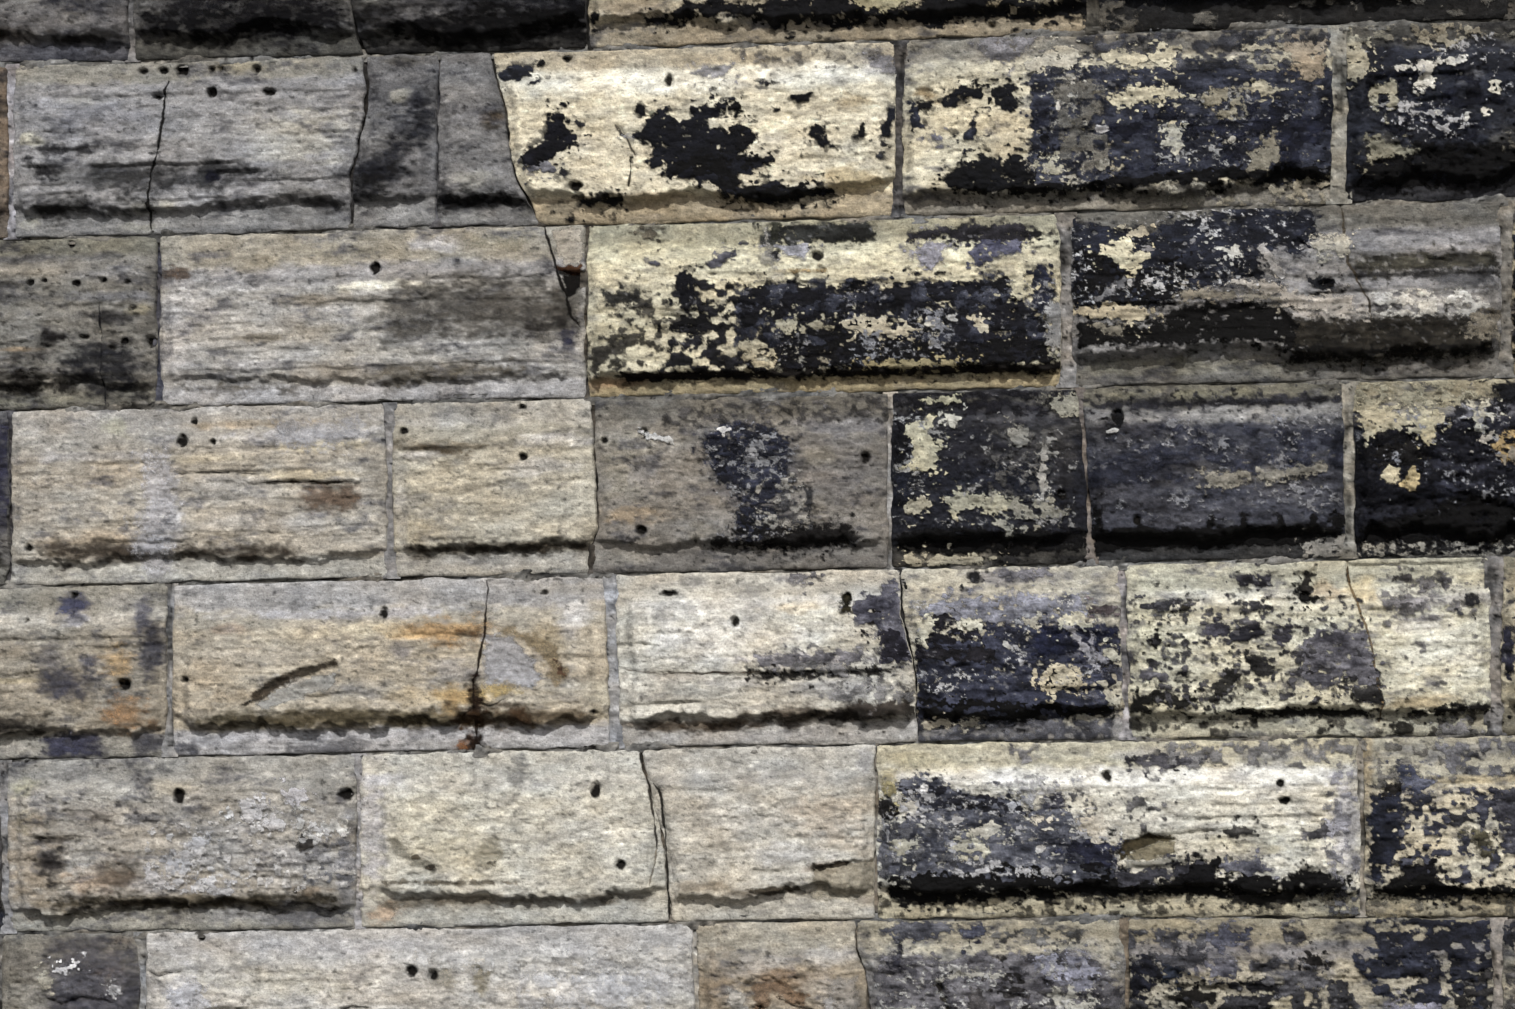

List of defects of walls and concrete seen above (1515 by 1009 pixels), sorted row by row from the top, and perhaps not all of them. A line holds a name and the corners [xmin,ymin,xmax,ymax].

peeling [495,56,551,91]
crack [145,80,169,230]
crack [544,228,580,326]
peeling [514,0,1515,1009]
corrosion [410,622,488,647]
corrosion [435,672,532,750]
crack [464,580,506,740]
crack [639,752,671,919]